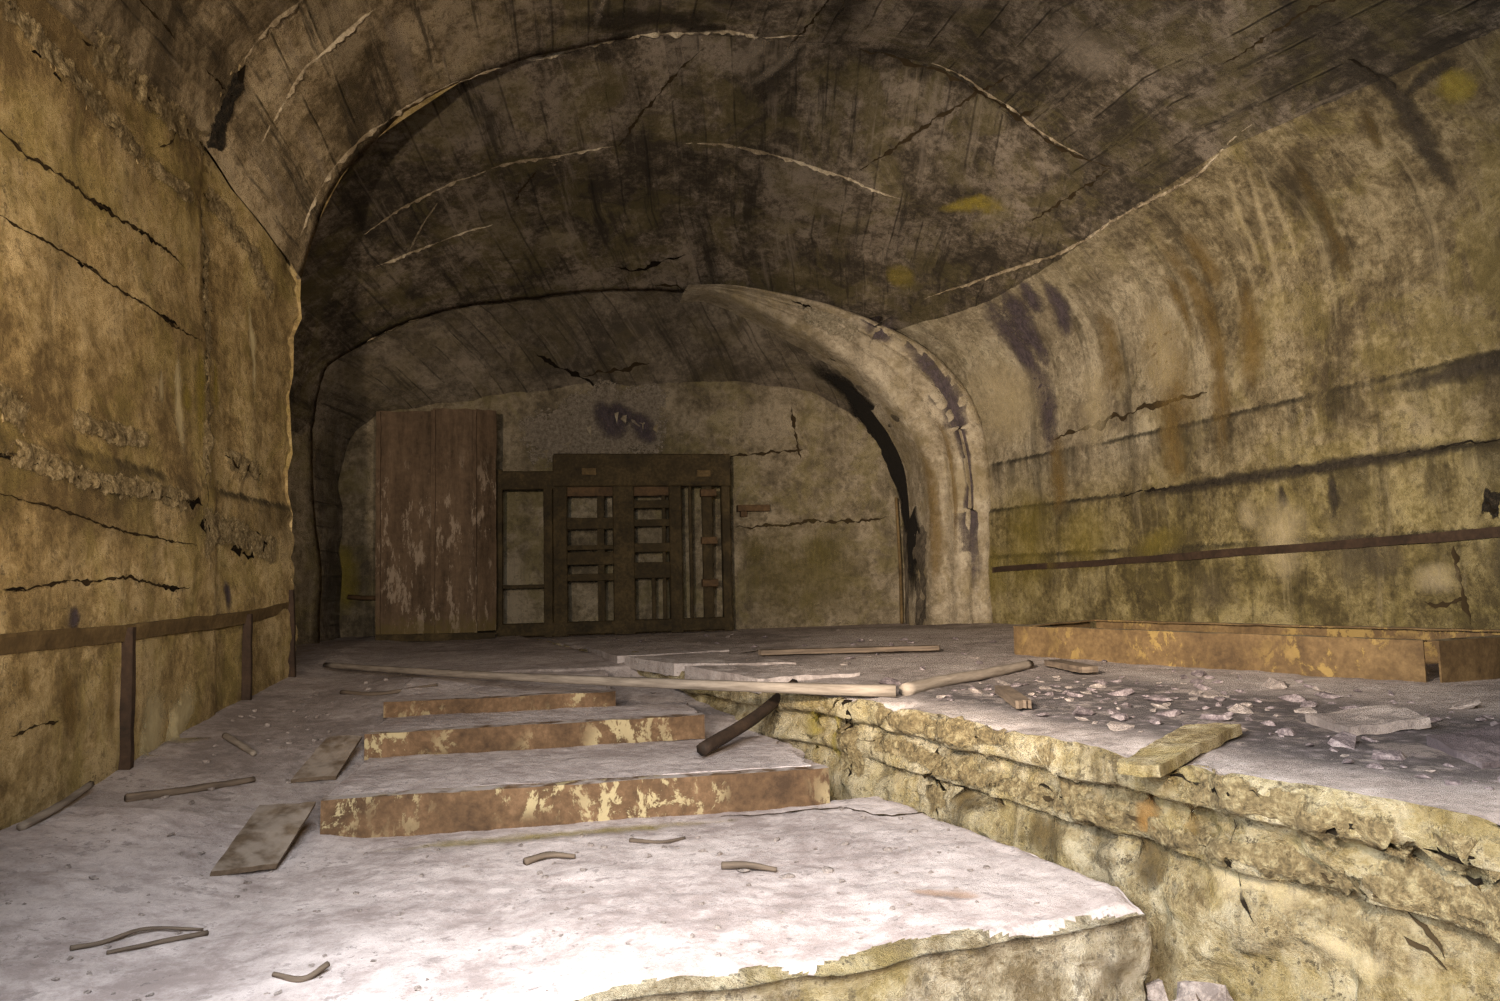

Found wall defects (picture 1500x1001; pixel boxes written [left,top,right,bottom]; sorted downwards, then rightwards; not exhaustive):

crack [140,0,177,42]
crack [786,0,830,54]
crack [1225,0,1336,63]
crack [858,49,1112,221]
crack [0,25,274,546]
leakage [611,403,655,442]
leakage [989,282,1070,504]
leakage [1118,439,1499,513]
crack [721,696,1500,970]